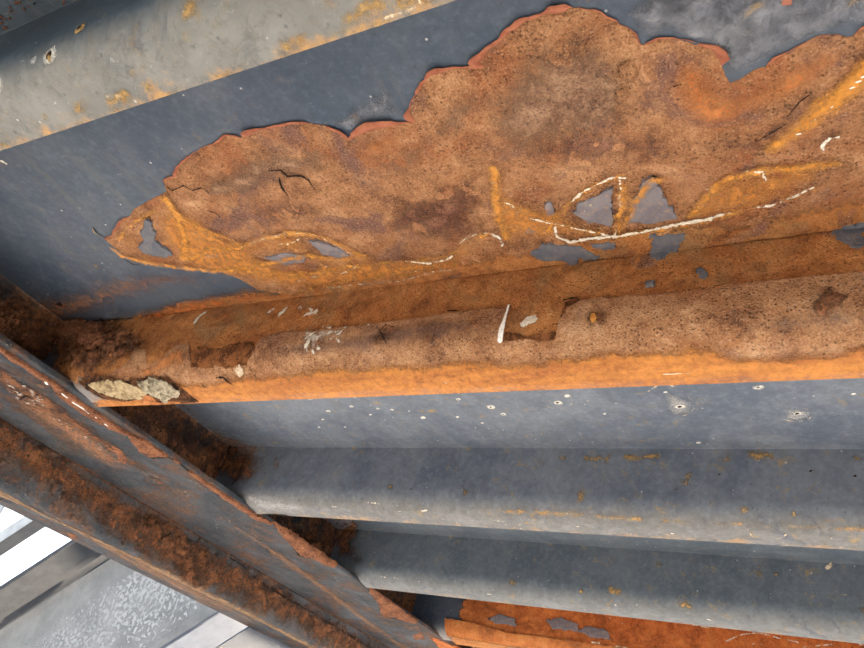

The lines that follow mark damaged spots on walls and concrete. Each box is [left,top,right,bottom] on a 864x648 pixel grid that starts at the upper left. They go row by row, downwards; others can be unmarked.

rust [37,0,864,385]
rust [0,367,163,485]
rust [97,348,864,479]
rust [0,421,398,648]
rust [432,637,516,648]
rust [459,599,864,648]